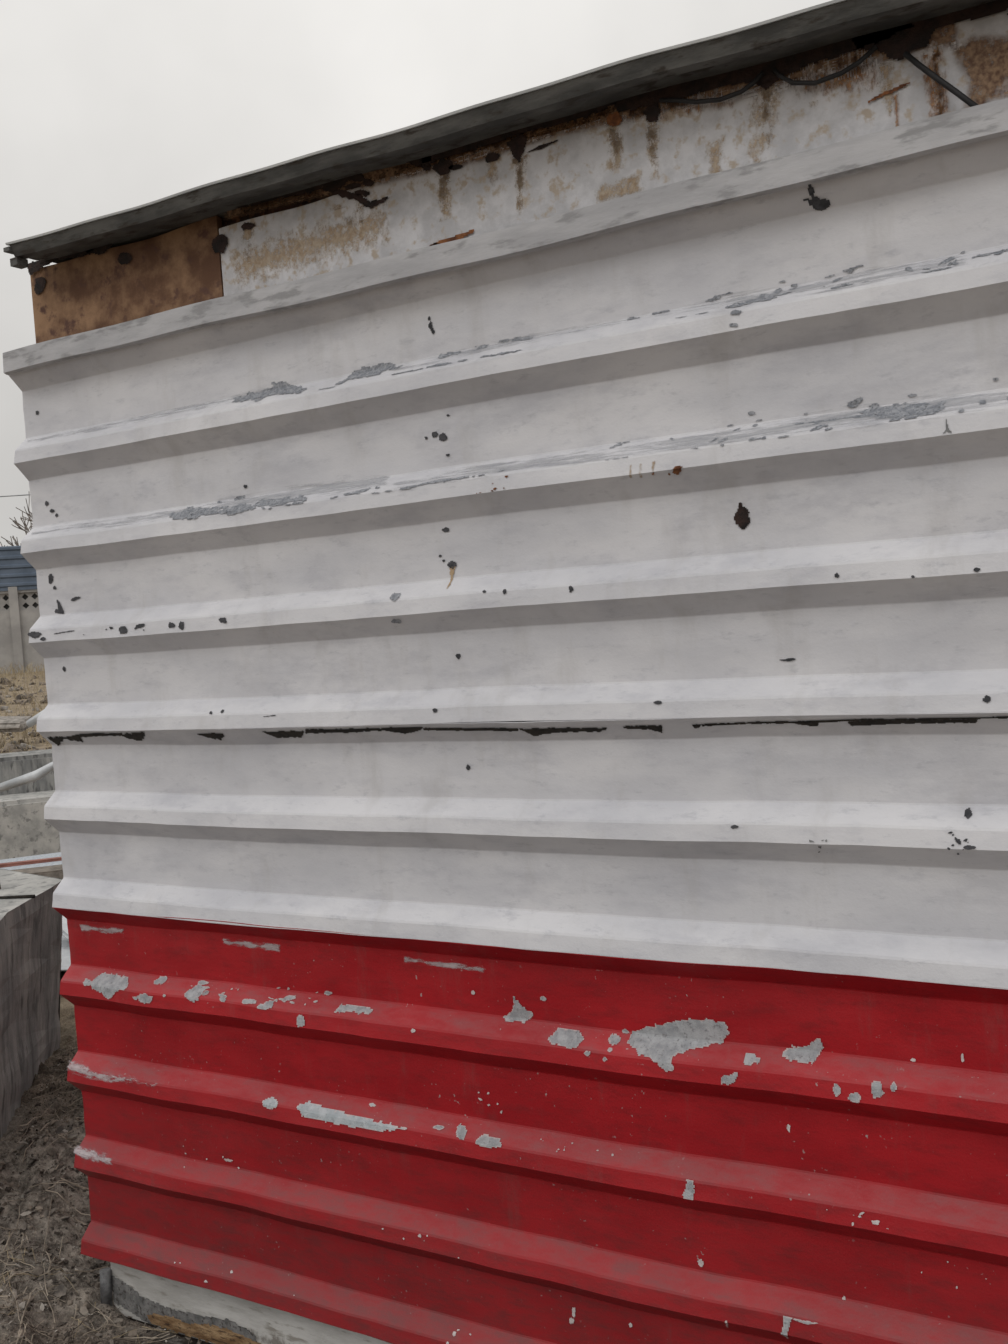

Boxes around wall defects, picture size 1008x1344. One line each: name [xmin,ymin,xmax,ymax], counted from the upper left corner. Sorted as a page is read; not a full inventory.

corrosion [226,0,1008,283]
corrosion [27,243,112,275]
peeling [75,334,551,433]
peeling [33,377,1008,534]
peeling [83,972,167,1004]
peeling [184,980,373,1027]
peeling [503,996,547,1023]
peeling [548,1018,730,1072]
peeling [262,1097,278,1109]
peeling [296,1101,407,1132]